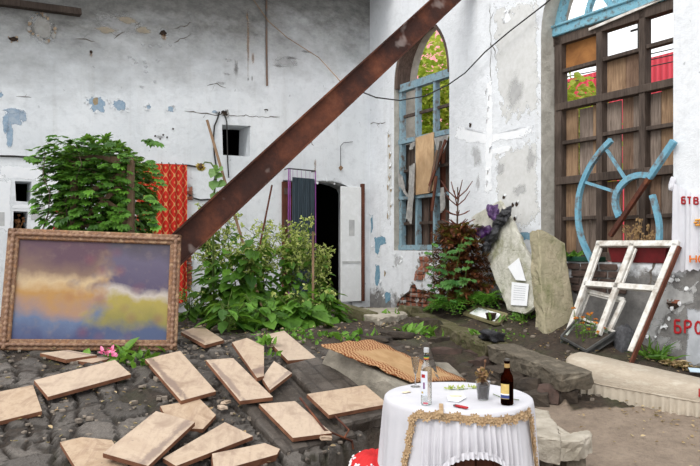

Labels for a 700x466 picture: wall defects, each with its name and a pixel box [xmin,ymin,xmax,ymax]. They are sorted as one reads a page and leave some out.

peeling [84,94,129,113]
flaking render [369,214,440,307]
peeling [645,275,699,350]